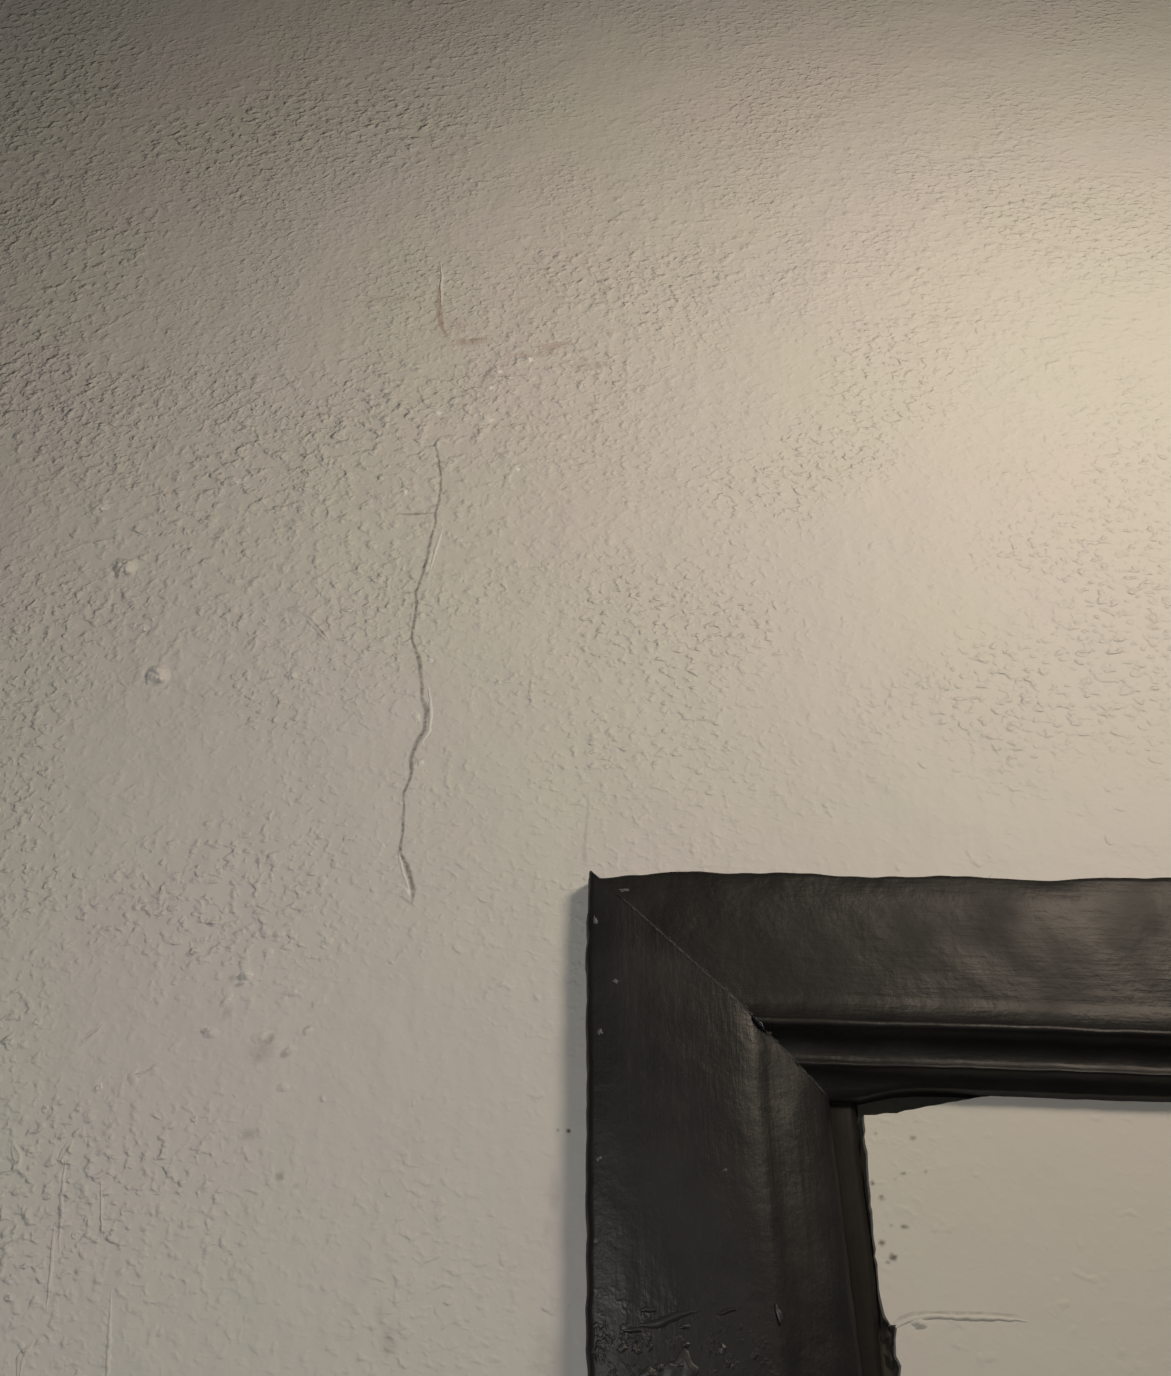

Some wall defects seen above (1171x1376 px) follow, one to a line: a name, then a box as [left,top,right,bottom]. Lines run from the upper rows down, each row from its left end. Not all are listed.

crack [410,529,443,766]
crack [397,824,412,896]